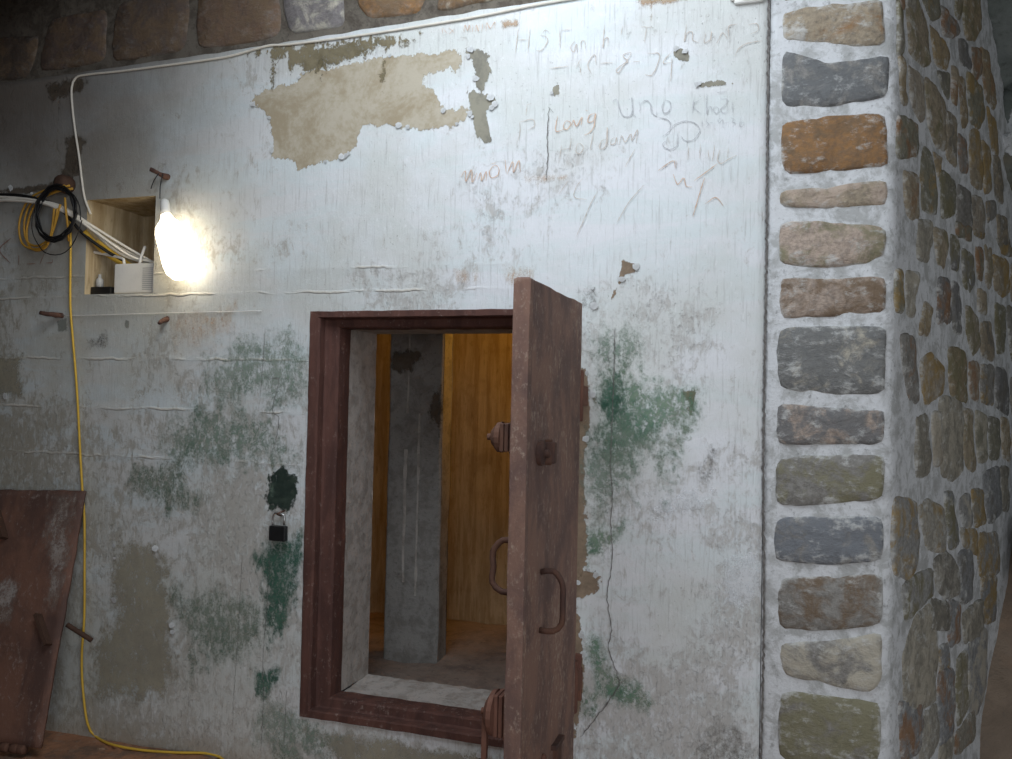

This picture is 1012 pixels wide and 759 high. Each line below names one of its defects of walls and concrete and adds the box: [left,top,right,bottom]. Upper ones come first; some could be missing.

peeling [251,47,498,171]
spalling [611,260,639,299]
leakage [683,390,696,412]
leakage [127,443,200,513]
leakage [253,533,303,648]
leakage [265,466,298,512]
spalling [574,368,602,738]
crack [583,331,626,734]